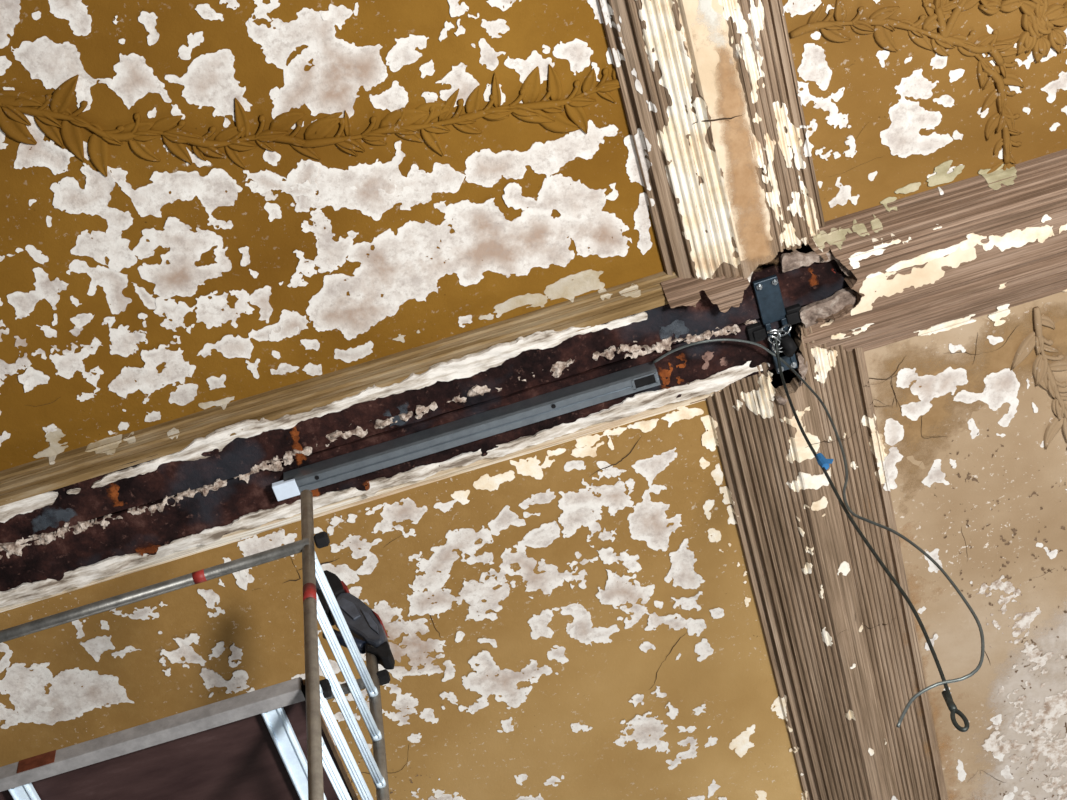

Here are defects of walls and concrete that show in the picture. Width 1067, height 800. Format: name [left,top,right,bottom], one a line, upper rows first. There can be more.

damp [698,0,772,262]
peeling [752,31,965,339]
peeling [0,114,655,455]
rust [110,484,123,507]
rust [135,545,161,556]
rust [290,426,306,464]
spalling [0,311,648,559]
rust [659,354,686,389]
rust [702,351,727,370]
peeling [861,367,1030,491]
peeling [613,686,755,770]
damp [986,615,1067,800]